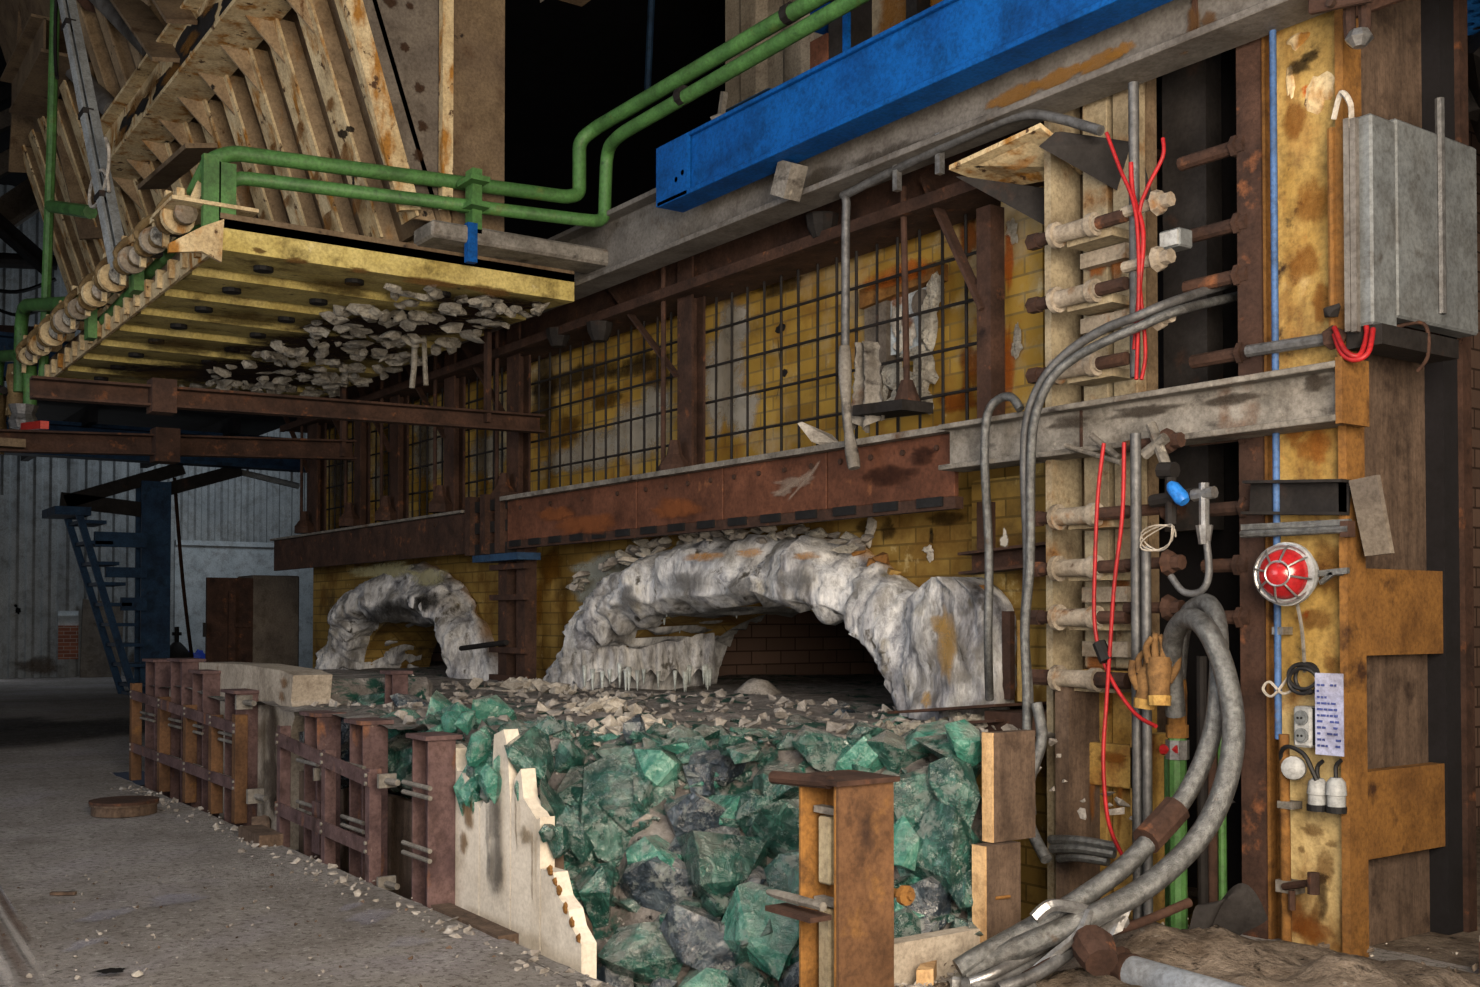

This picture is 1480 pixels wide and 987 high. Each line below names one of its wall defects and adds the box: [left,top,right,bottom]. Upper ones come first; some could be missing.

rust [1292,249,1329,320]
spalling [881,271,945,415]
damp [544,387,668,473]
rust [865,447,934,485]
rust [541,507,611,533]